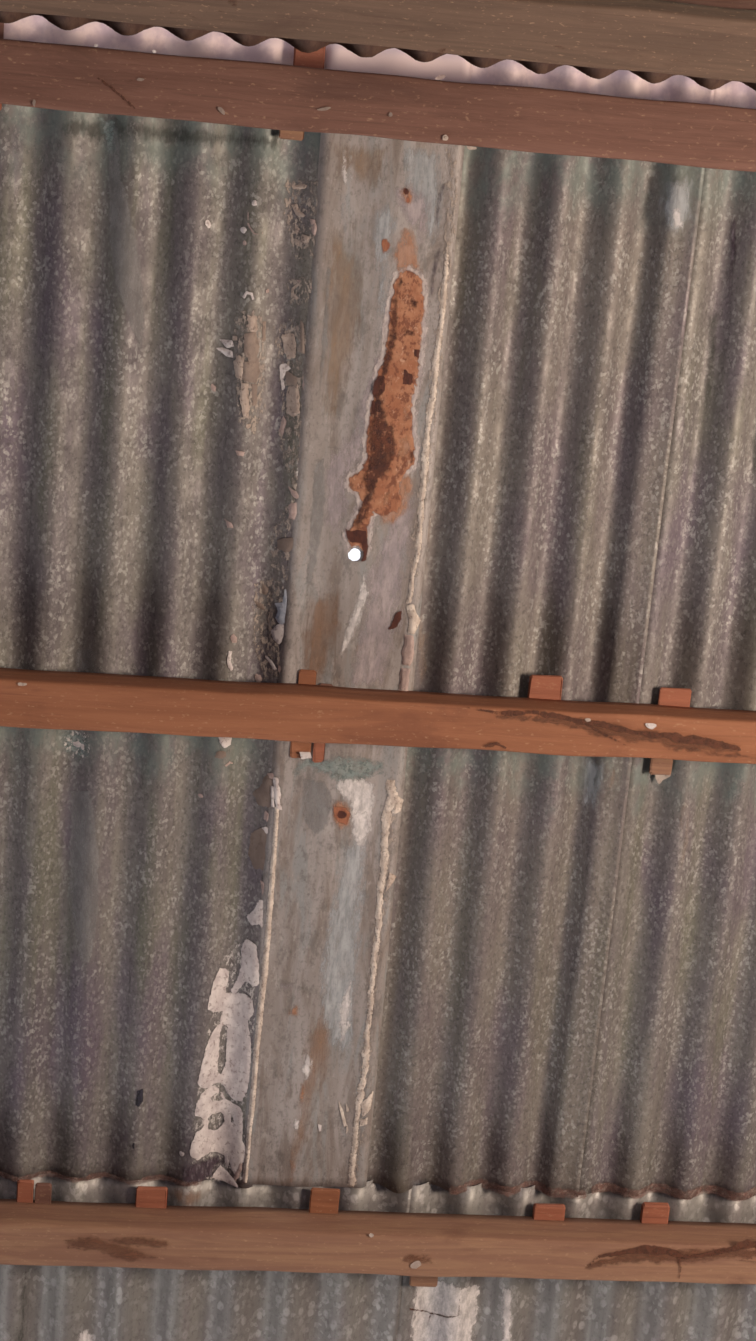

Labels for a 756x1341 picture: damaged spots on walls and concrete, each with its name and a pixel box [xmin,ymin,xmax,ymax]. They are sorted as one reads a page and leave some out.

peeling [240,200,263,245]
peeling [284,179,318,261]
peeling [217,277,312,682]
rust [342,229,428,562]
peeling [215,737,233,766]
peeling [179,773,282,1188]